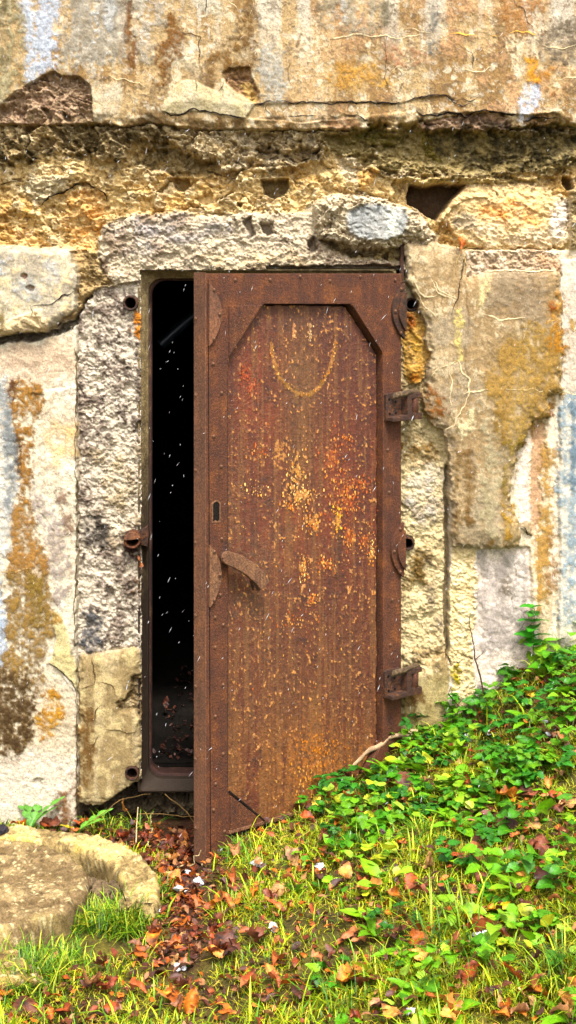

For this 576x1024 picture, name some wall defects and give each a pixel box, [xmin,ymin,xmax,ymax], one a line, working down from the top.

crack [164,0,574,122]
spalling [0,68,576,820]
corrosion [279,425,378,583]
corrosion [401,311,447,419]
crack [430,359,576,429]
crack [485,313,526,321]
water stain [0,375,108,756]
corrosion [255,698,355,800]